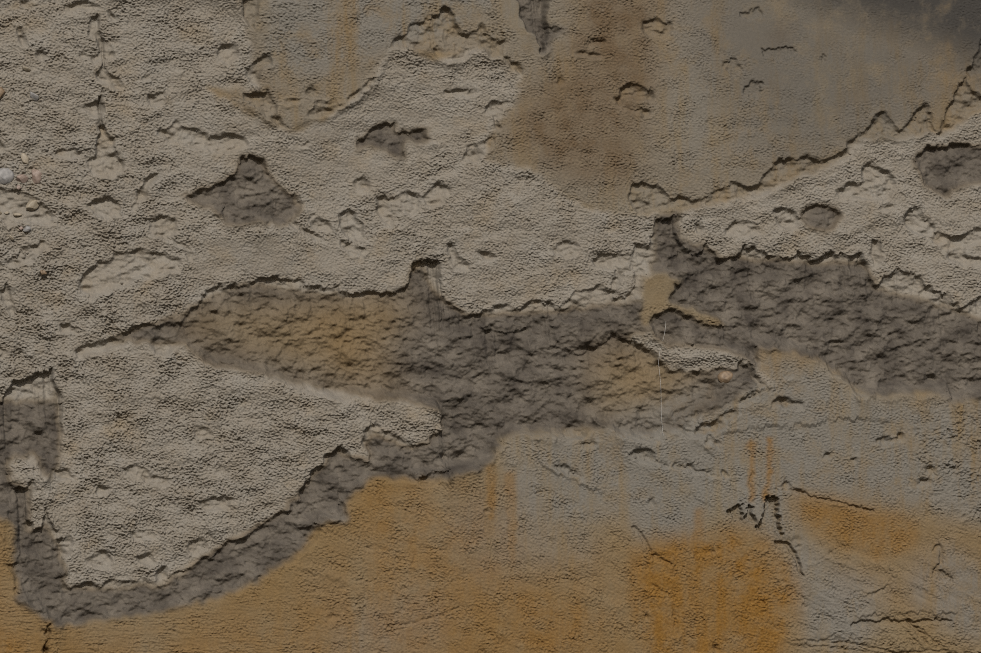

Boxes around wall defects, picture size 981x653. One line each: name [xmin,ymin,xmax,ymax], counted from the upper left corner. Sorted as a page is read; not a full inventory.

spalling [759,45,799,63]
spalling [0,0,725,592]
spalling [677,112,981,320]
flaking render [494,331,913,532]